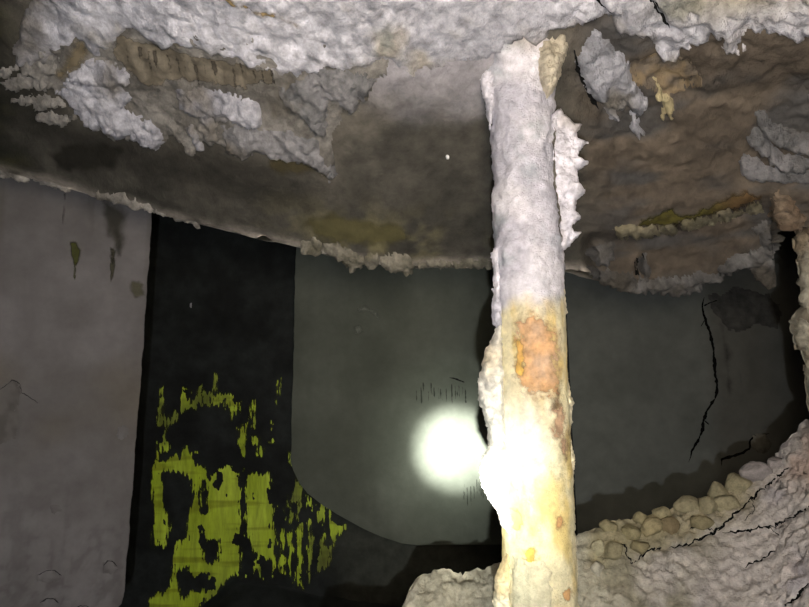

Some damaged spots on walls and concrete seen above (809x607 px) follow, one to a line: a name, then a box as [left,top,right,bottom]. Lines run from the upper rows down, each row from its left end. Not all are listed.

crack [650,0,670,28]
peeling [0,35,377,183]
water stain [12,0,809,179]
corrosion [514,316,568,459]
crack [689,299,719,460]
crack [622,468,809,569]
crack [785,583,809,607]